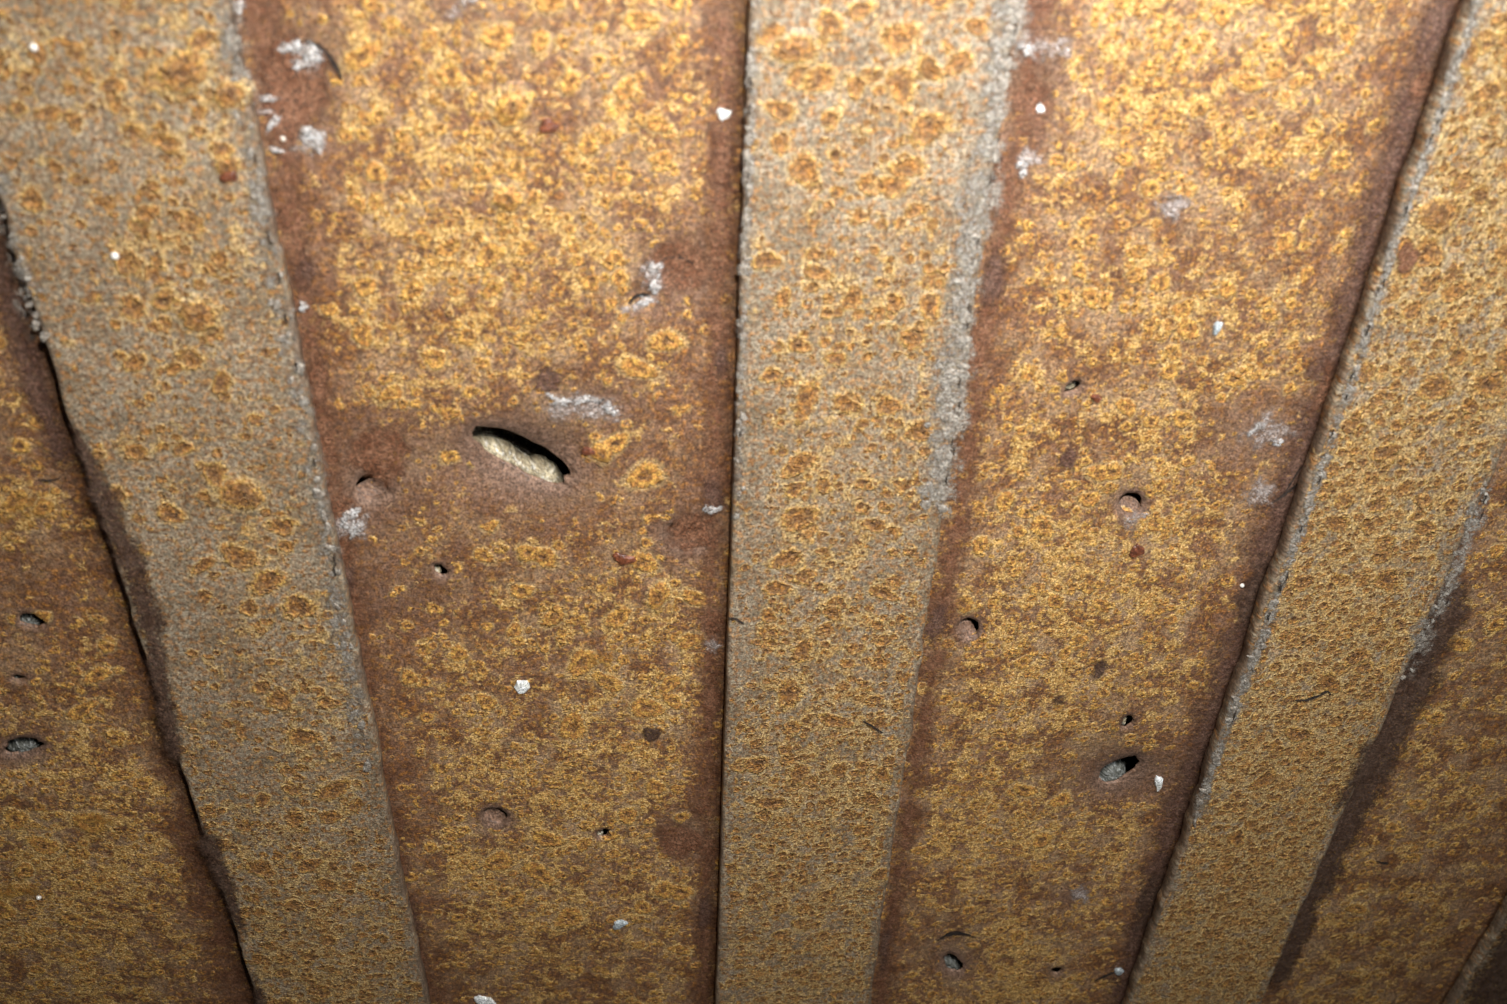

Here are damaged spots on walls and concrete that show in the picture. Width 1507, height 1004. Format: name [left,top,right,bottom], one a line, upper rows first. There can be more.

corrosion [487,81,560,137]
corrosion [535,366,562,391]
spalling [473,432,564,483]
corrosion [581,435,620,469]
corrosion [0,228,181,761]
corrosion [143,0,446,1004]
corrosion [640,0,828,1004]
corrosion [873,0,1059,1004]
corrosion [1110,0,1471,1004]
crack [1271,462,1322,533]
crack [1295,691,1331,701]
spalling [1099,759,1126,782]